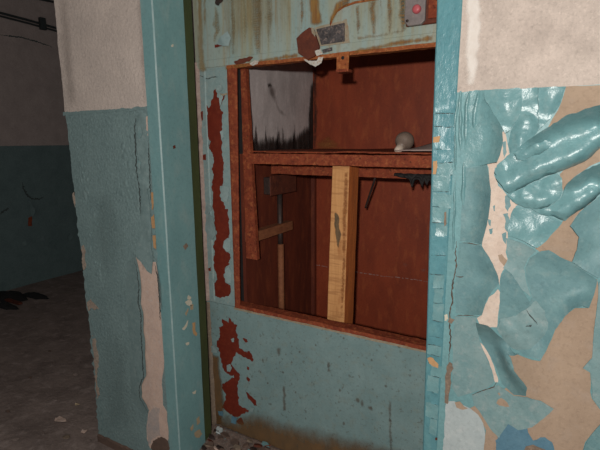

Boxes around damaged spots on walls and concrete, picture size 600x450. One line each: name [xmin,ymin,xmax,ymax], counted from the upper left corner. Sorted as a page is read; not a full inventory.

peeling [63,106,170,450]
corrosion [213,356,369,450]
peeling [435,85,600,450]